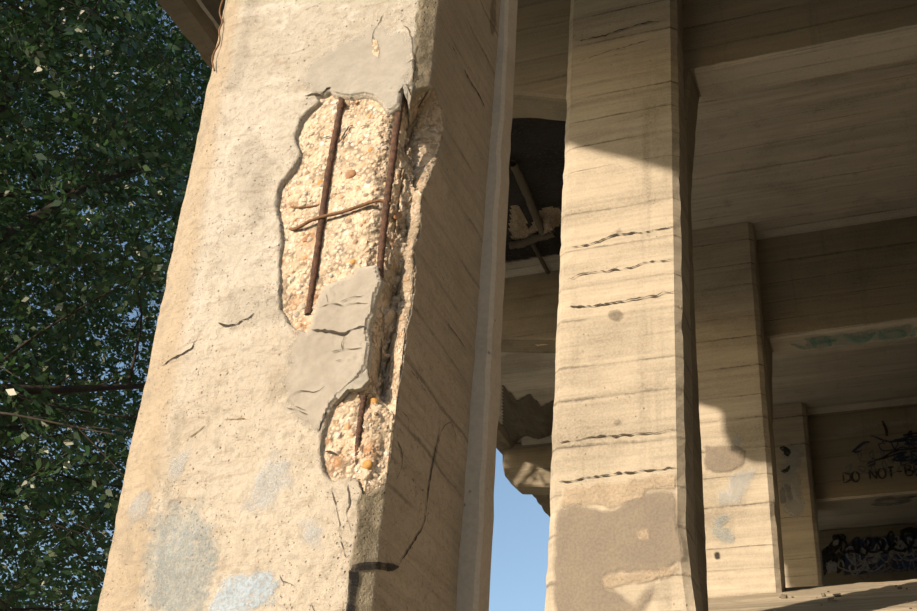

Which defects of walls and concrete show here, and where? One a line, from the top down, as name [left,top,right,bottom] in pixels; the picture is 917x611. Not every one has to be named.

crack [580,21,658,61]
spalling [508,160,562,274]
crack [573,226,673,247]
spalling [279,27,443,495]
crack [569,259,670,279]
crack [568,291,674,308]
spalling [502,385,554,443]
crack [560,429,677,443]
crack [399,422,456,564]
crack [559,467,674,482]
leakage [554,492,683,611]